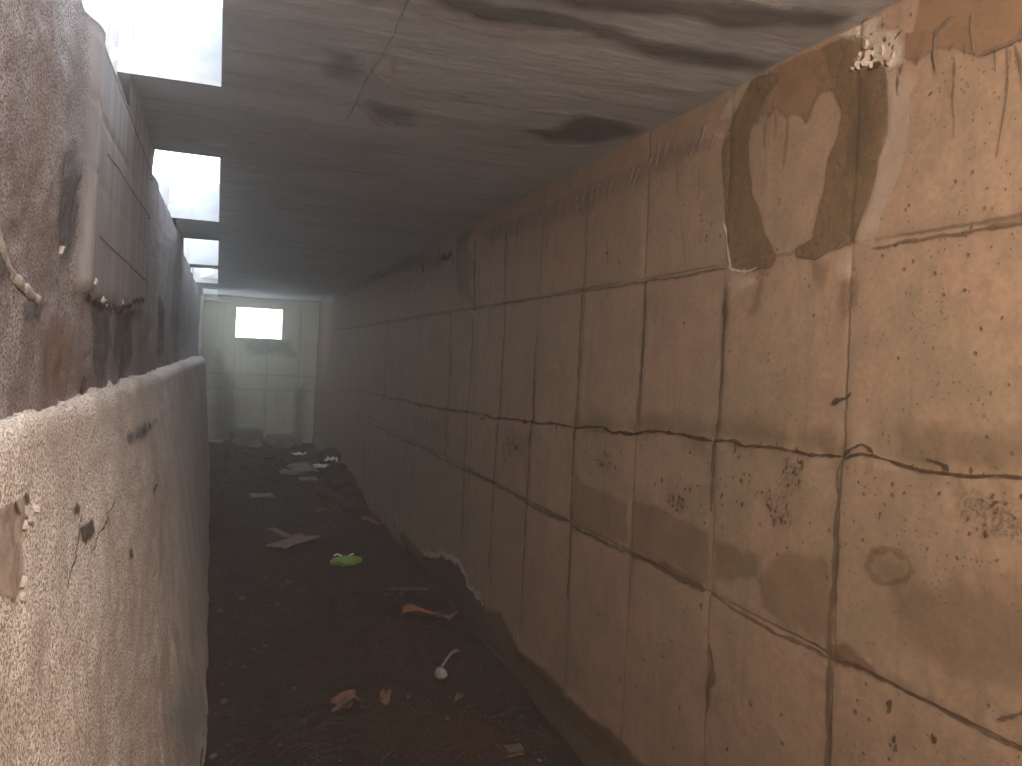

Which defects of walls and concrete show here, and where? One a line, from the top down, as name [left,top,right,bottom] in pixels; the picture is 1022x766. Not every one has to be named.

water stain [431,0,1022,521]
crack [871,223,1022,249]
spalling [0,493,40,602]
crack [330,389,1022,751]